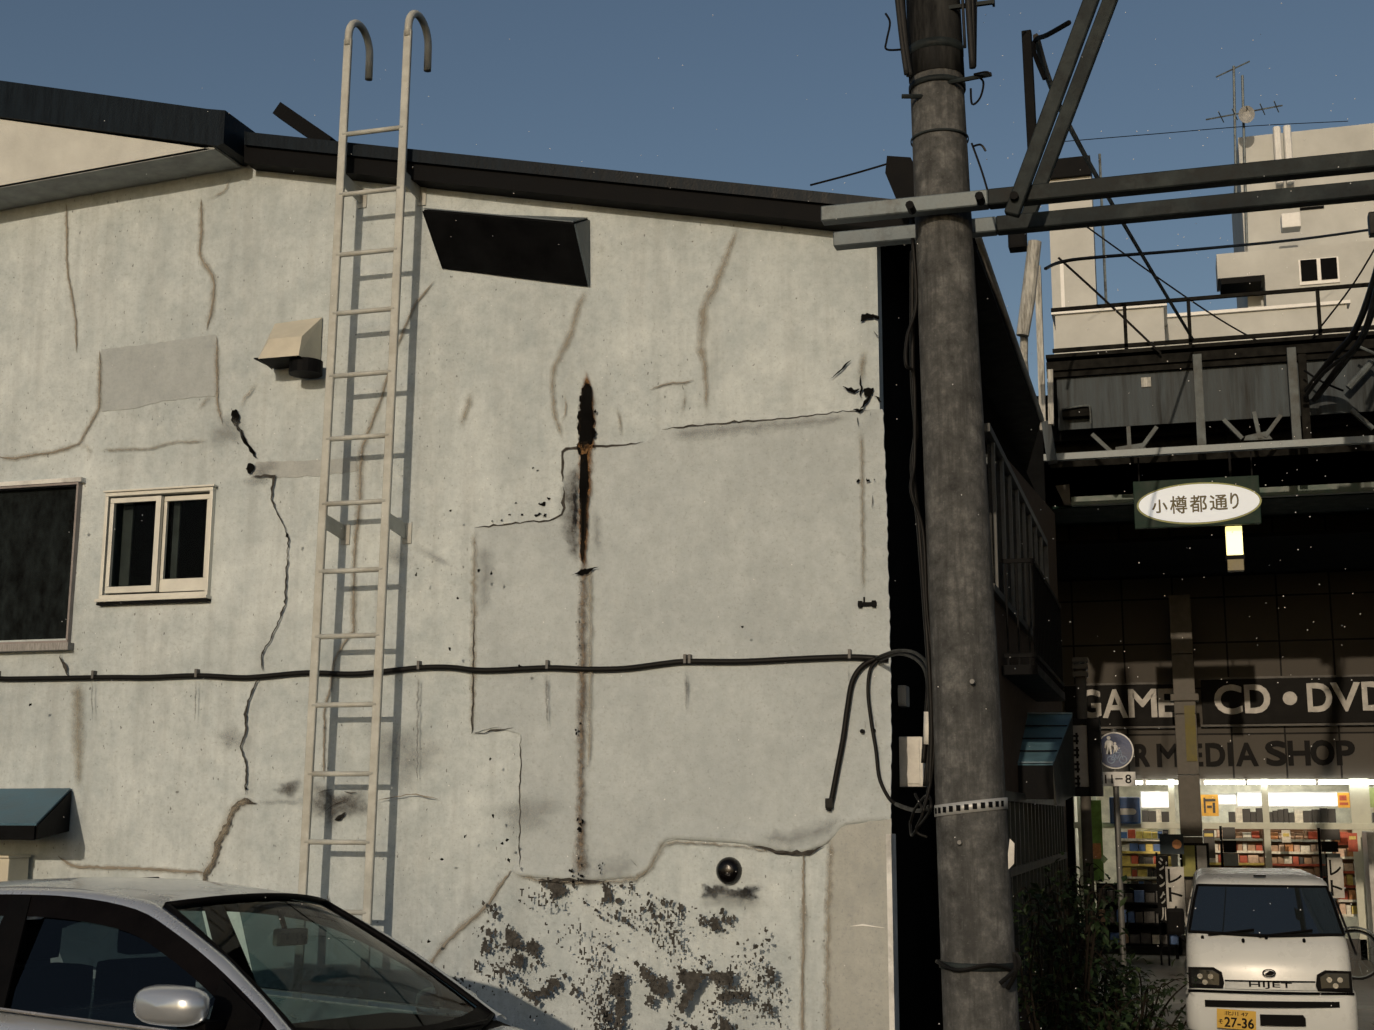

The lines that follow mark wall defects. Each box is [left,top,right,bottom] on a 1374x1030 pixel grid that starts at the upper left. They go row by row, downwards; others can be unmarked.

crack [1,187,289,881]
rust [569,375,603,884]
peeling [443,877,786,1030]